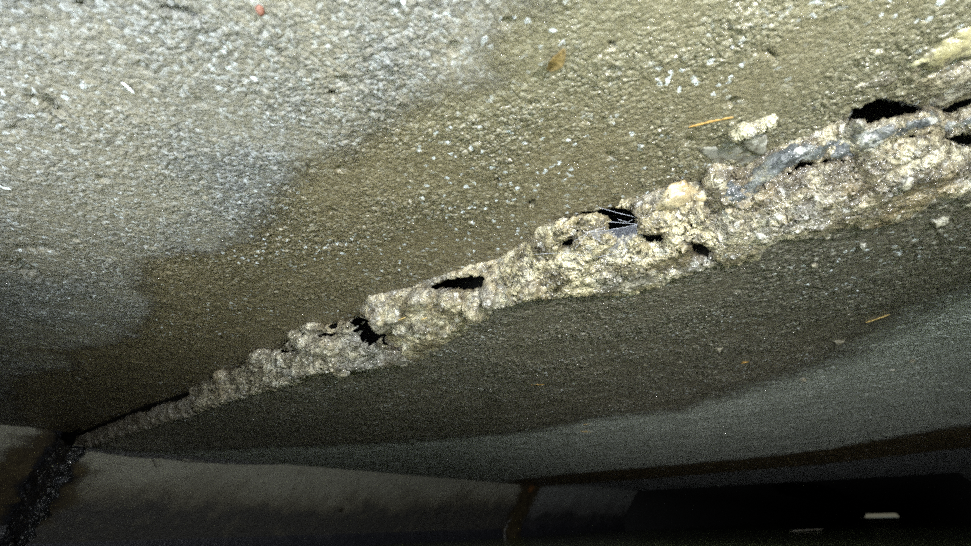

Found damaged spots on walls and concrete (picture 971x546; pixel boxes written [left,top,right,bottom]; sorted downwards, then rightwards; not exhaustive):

peeling [697,113,779,166]
spalling [898,177,914,190]
spalling [931,216,951,228]